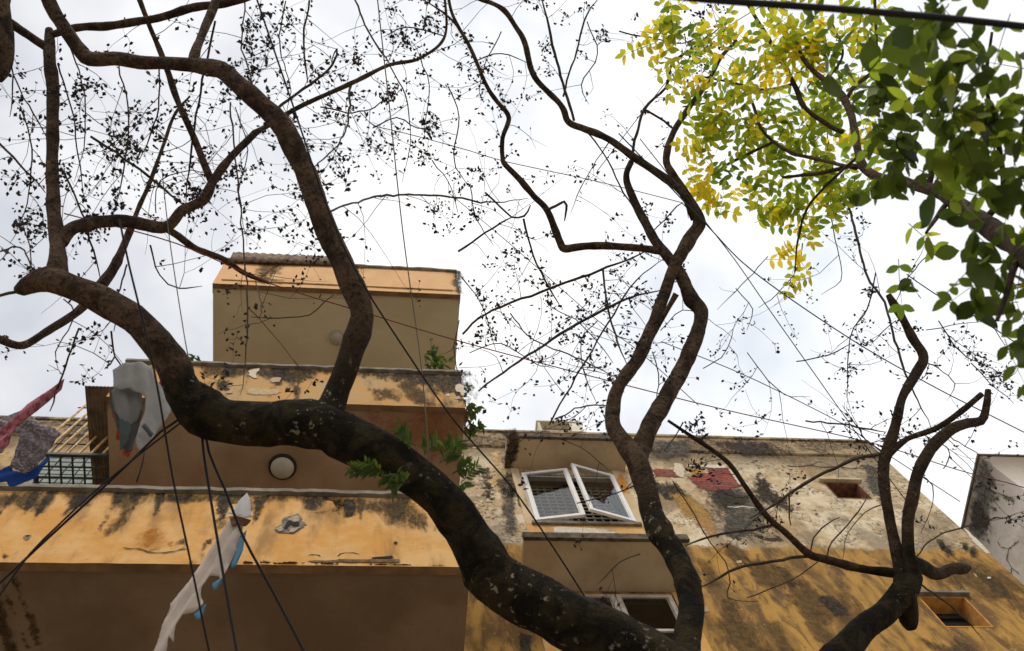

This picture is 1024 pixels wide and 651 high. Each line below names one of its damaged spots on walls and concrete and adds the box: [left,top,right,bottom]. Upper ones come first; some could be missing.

peeling [246,368,281,395]
leakage [203,367,332,399]
leakage [486,428,521,536]
spalling [652,463,742,491]
leakage [862,461,893,503]
leakage [0,491,101,516]
crack [123,545,189,553]
leakage [101,486,427,549]
spalling [275,513,307,534]
leakage [705,439,862,651]
leakage [933,459,1024,611]
leakage [922,639,975,651]